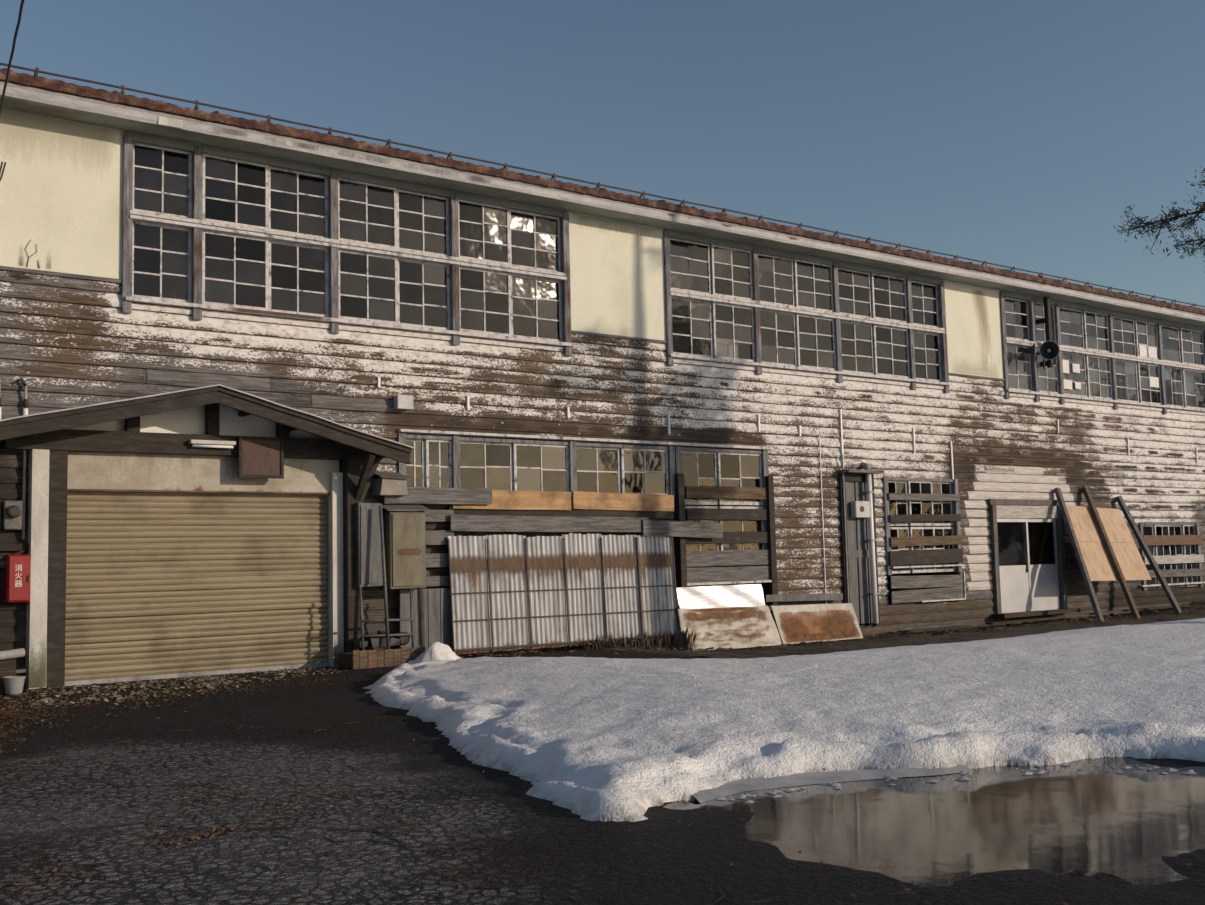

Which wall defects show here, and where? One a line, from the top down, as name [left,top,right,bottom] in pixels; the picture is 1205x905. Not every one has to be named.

peeling [8,272,33,281]
peeling [46,293,180,352]
peeling [577,335,624,367]
peeling [335,373,394,395]
peeling [407,367,624,401]
peeling [542,414,764,441]
peeling [950,394,1205,473]
peeling [1121,487,1205,523]
peeling [777,468,840,587]
corrosion [450,552,672,585]
corrosion [457,603,863,654]